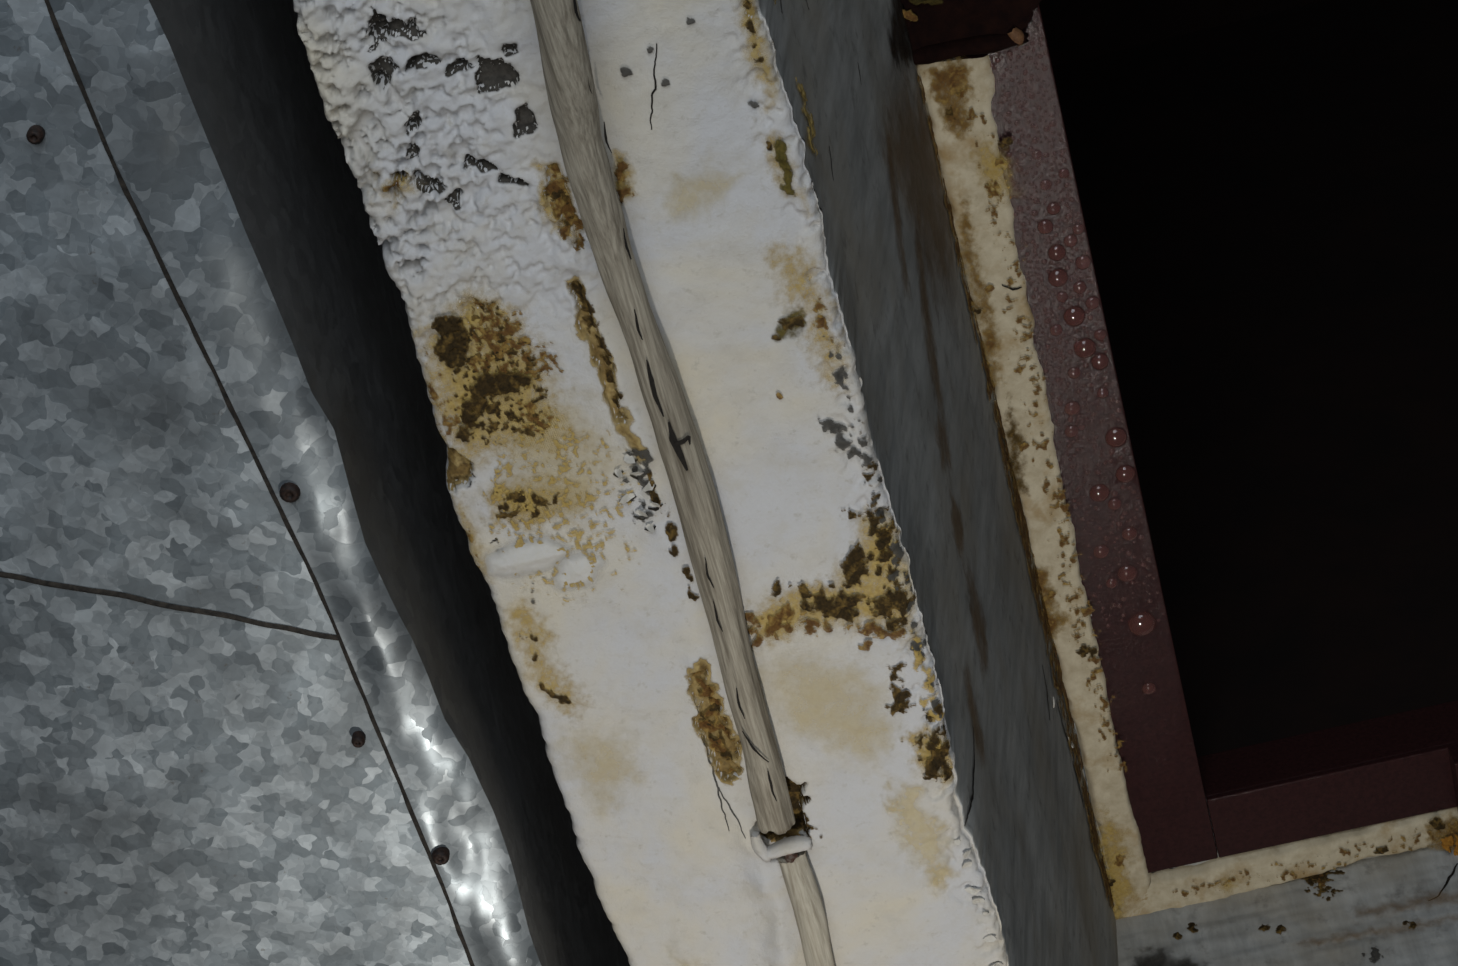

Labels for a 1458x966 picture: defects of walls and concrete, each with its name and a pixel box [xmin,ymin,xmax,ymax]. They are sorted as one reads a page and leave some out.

spalling [366,7,520,94]
damp [890,0,913,67]
spalling [396,110,463,210]
spalling [463,154,529,186]
spalling [513,103,538,138]
damp [772,309,806,341]
damp [415,297,640,602]
rust [917,59,1132,919]
damp [705,558,723,632]
damp [745,336,953,885]